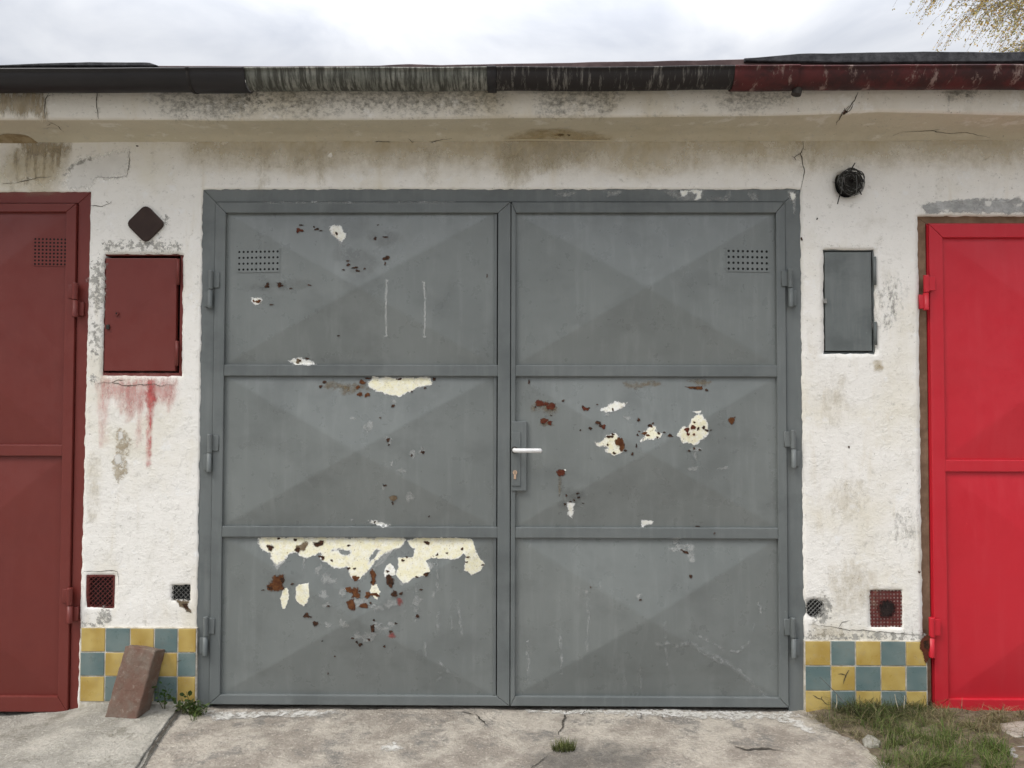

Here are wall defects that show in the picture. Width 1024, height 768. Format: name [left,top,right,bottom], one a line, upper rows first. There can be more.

crack [836,93,858,124]
damp [195,131,764,167]
flaking render [923,198,1024,215]
peeling [356,376,436,408]
corrosion [534,400,564,425]
peeling [595,410,712,456]
flaking render [112,428,130,482]
peeling [257,520,485,611]
peeling [280,583,318,627]